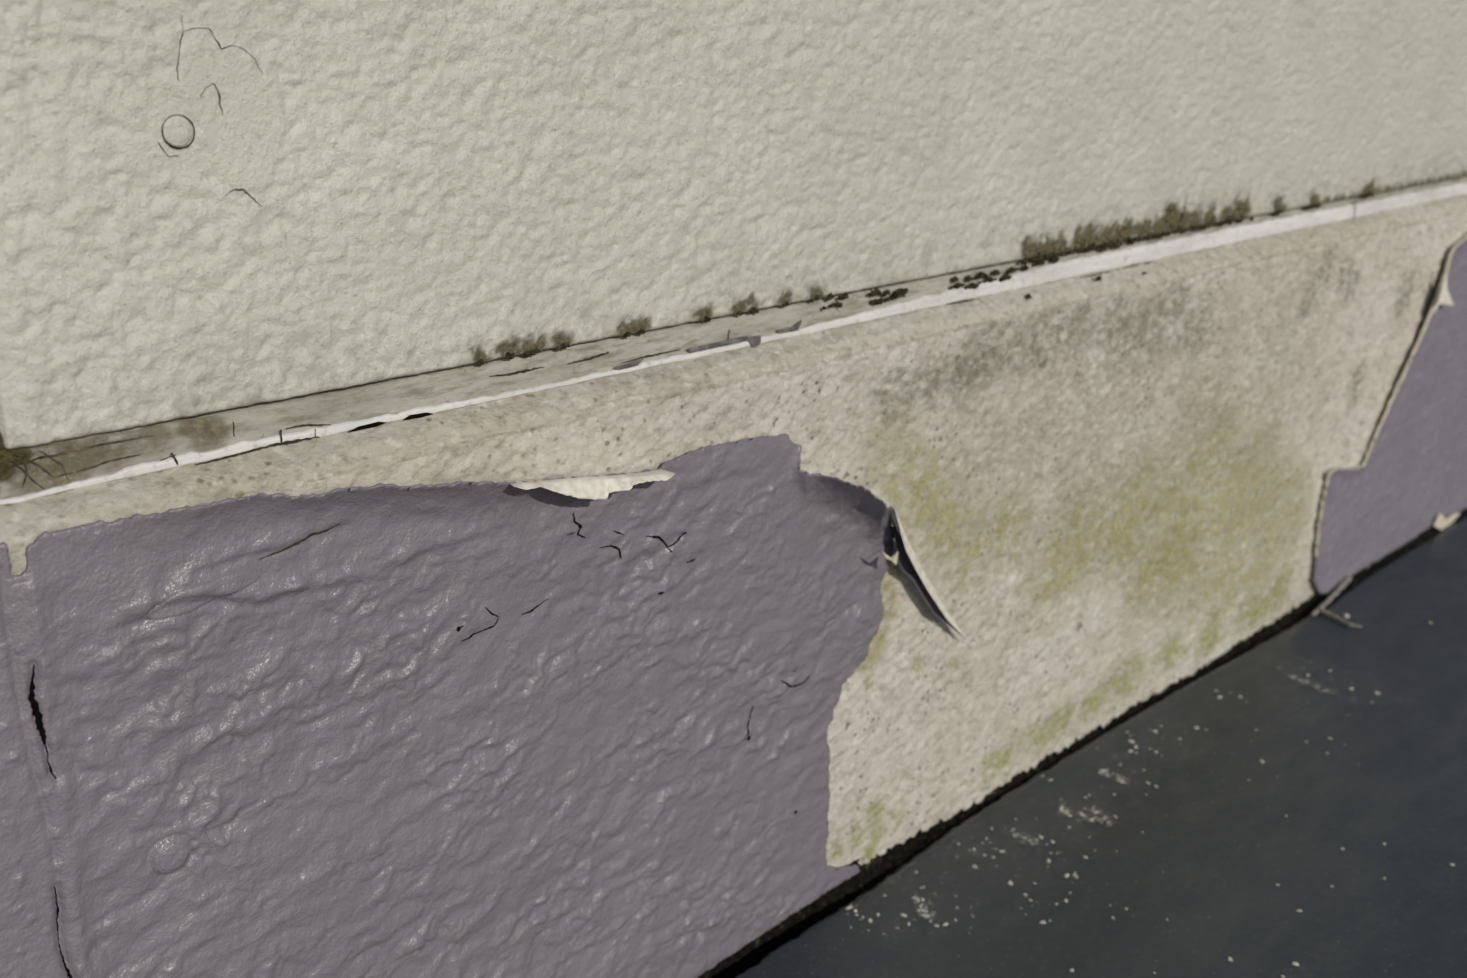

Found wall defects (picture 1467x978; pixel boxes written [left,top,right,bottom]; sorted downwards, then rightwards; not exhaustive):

water stain [876,284,1206,419]
peeling [9,551,27,575]
peeling [268,213,1467,867]
crack [28,664,57,779]
crack [54,887,73,978]